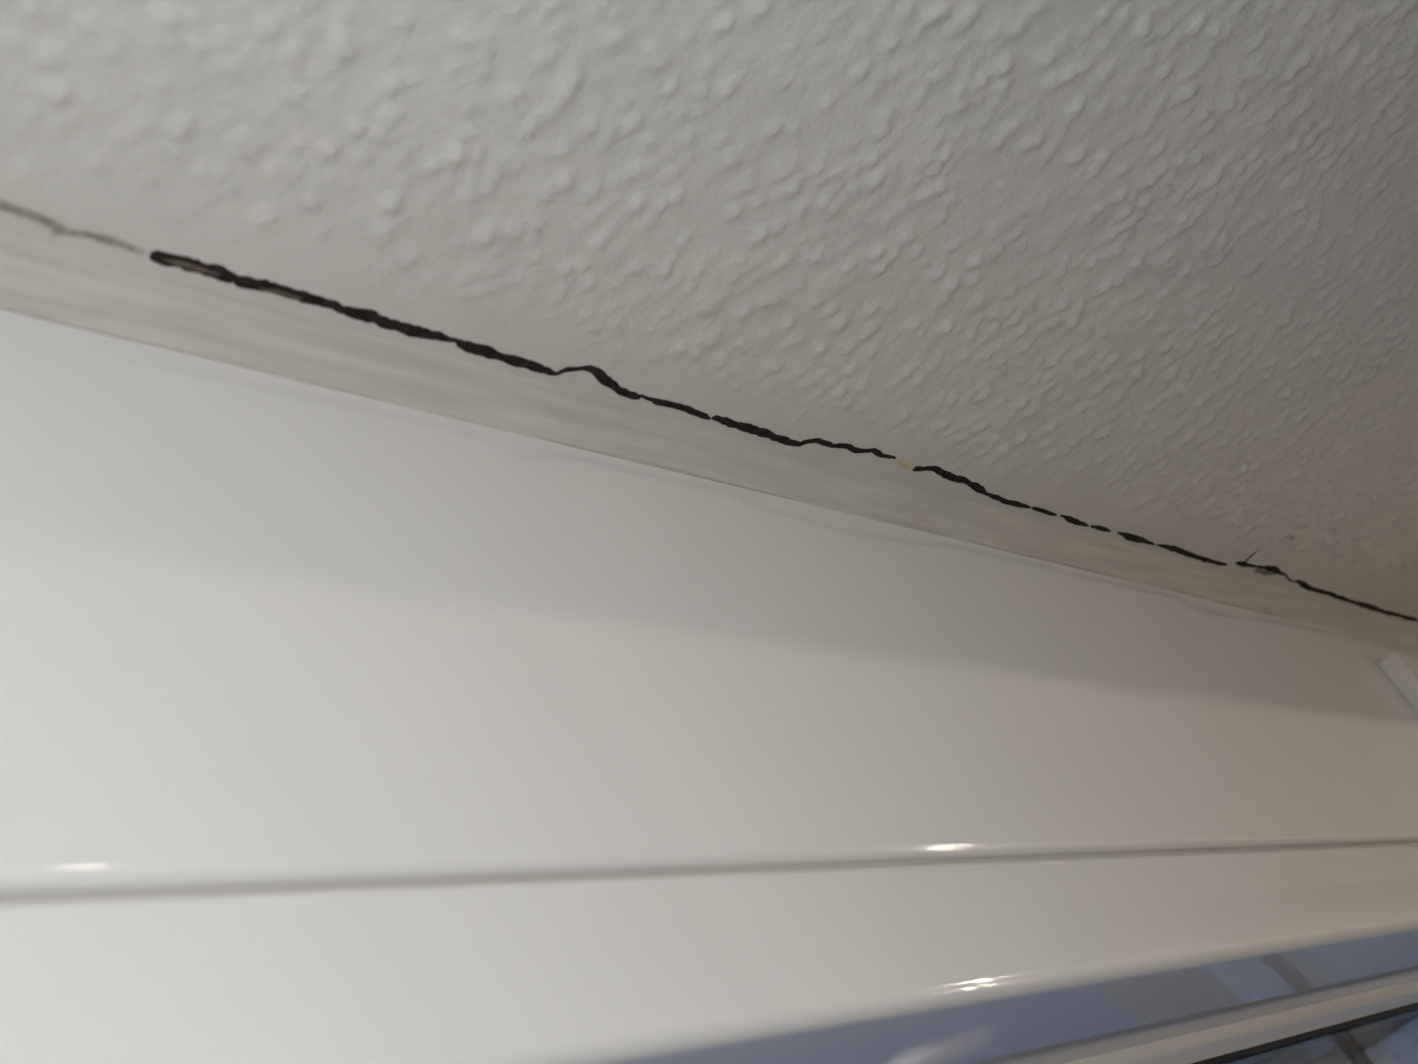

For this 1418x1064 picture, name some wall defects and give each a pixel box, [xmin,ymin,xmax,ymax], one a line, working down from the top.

crack [0,204,1418,621]